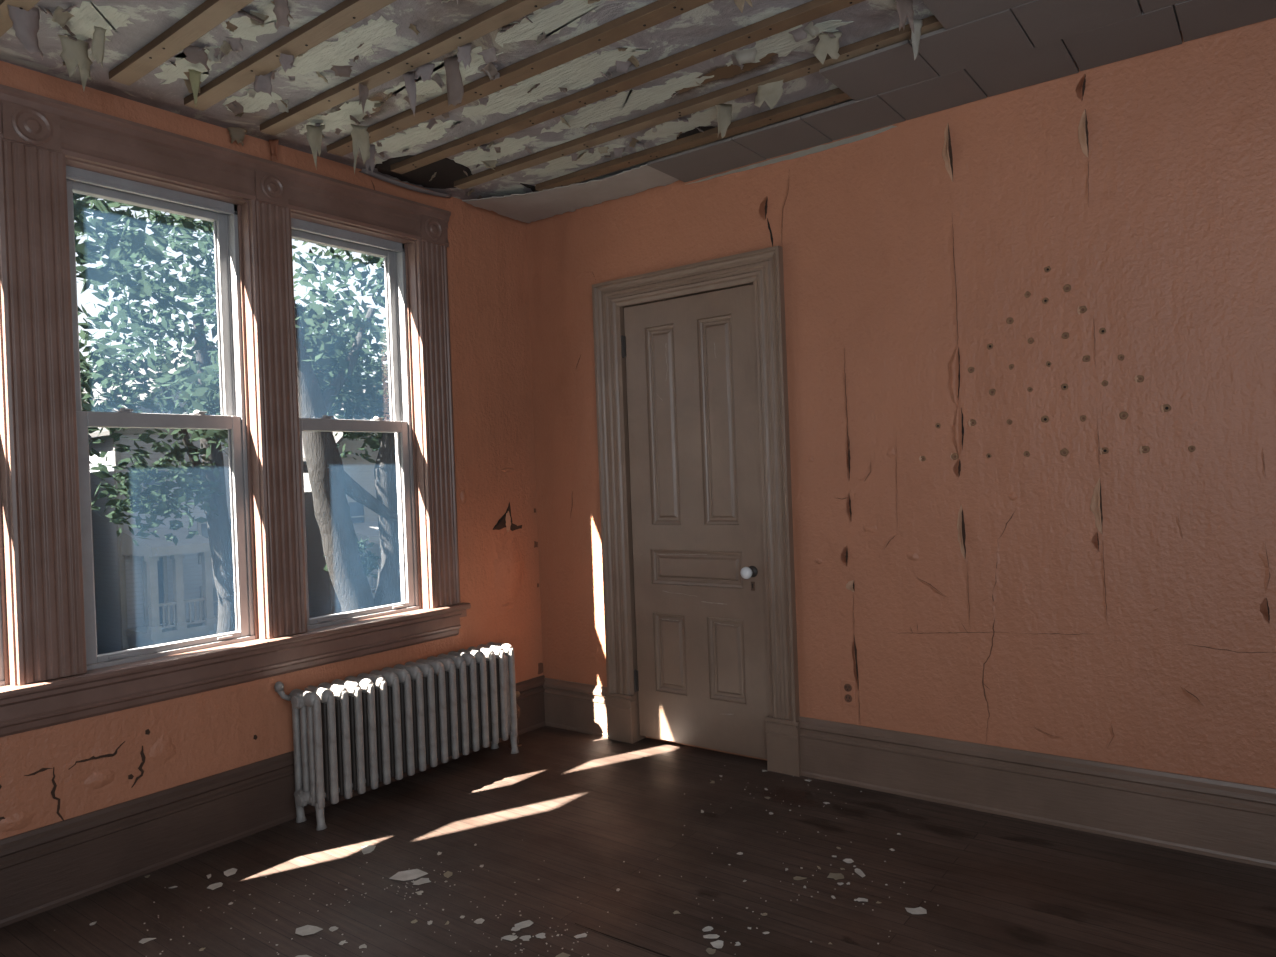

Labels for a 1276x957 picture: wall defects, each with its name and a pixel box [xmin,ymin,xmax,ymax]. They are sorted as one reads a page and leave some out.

peeling [7,1,135,91]
peeling [154,0,294,105]
peeling [222,0,651,175]
peeling [451,72,714,199]
peeling [522,80,784,177]
peeling [726,20,853,70]
flaking render [685,125,897,185]
crack [767,172,789,247]
crack [949,213,958,346]
spalling [493,502,522,532]
crack [889,513,1108,740]
crack [24,741,149,821]